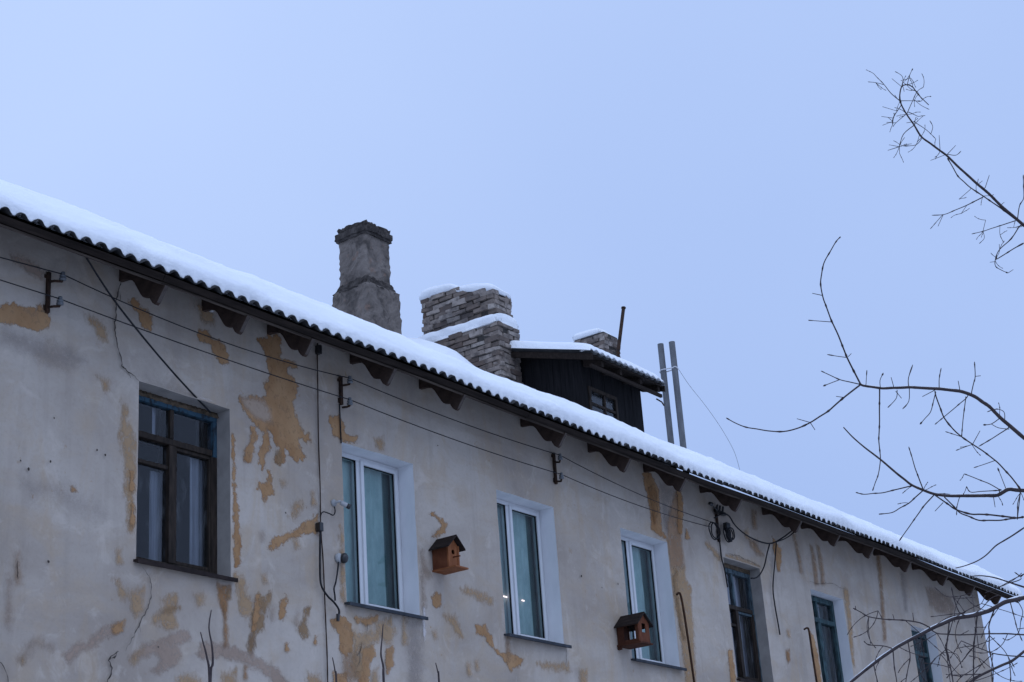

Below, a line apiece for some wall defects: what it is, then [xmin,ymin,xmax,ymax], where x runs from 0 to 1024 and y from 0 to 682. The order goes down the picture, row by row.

peeling [0,301,51,332]
crack [114,283,138,380]
peeling [197,305,229,365]
peeling [328,415,357,443]
peeling [119,408,137,531]
peeling [231,334,318,615]
peeling [431,512,448,537]
peeling [642,472,696,682]
crack [107,569,152,682]
peeling [330,615,394,682]
peeling [475,623,523,670]